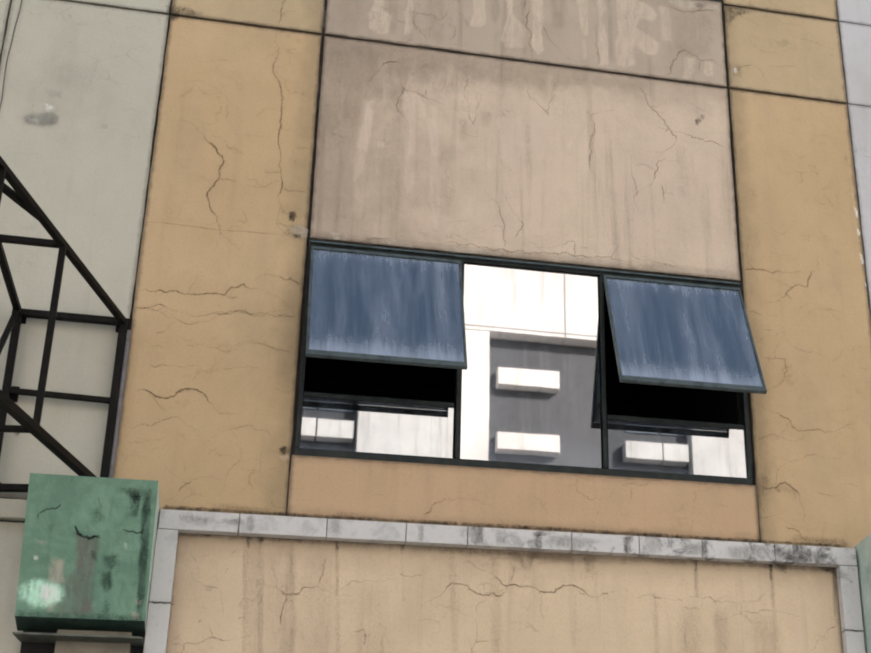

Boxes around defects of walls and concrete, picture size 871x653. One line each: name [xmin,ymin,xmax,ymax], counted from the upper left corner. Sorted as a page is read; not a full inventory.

crack [160,41,306,247]
damp [310,0,672,239]
crack [630,88,718,206]
crack [133,274,300,334]
crack [135,388,271,448]
crack [745,245,852,541]
crack [276,561,417,622]
damp [16,485,848,653]
crack [425,559,609,620]